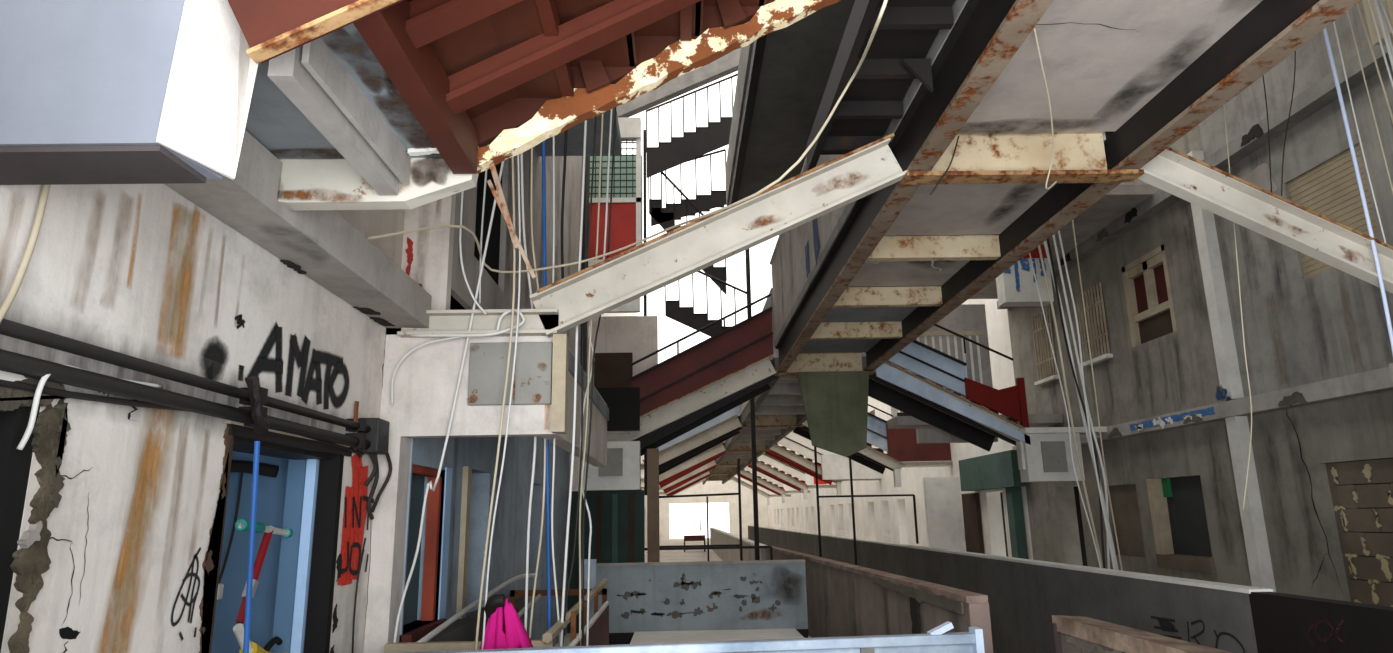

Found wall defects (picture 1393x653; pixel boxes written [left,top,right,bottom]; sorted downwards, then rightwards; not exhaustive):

crack [1036,22,1139,32]
leakage [1113,86,1151,109]
leakage [974,124,1016,134]
rust [160,207,200,356]
spalling [0,370,71,653]
crack [1286,409,1342,590]
rust [101,434,160,653]
peeling [617,572,800,619]
spalling [59,627,80,640]